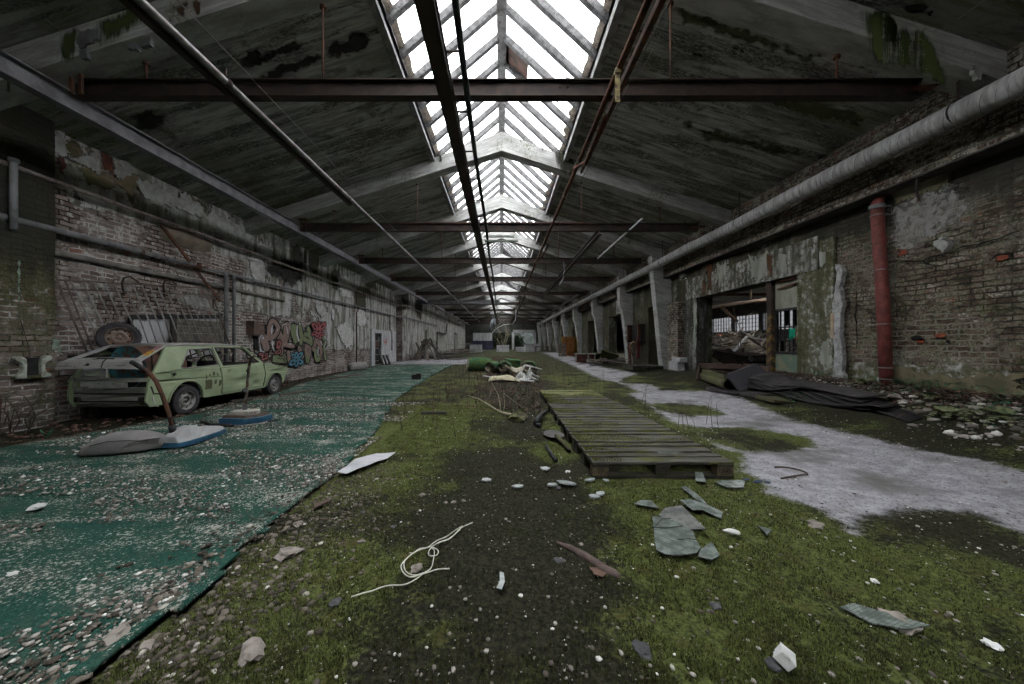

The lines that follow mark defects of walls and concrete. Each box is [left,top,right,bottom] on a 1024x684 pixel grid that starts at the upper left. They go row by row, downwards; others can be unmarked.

leakage [62,28,78,60]
leakage [100,9,138,40]
leakage [241,32,370,78]
leakage [866,11,946,86]
flaking render [55,130,274,287]
flaking render [309,274,367,349]